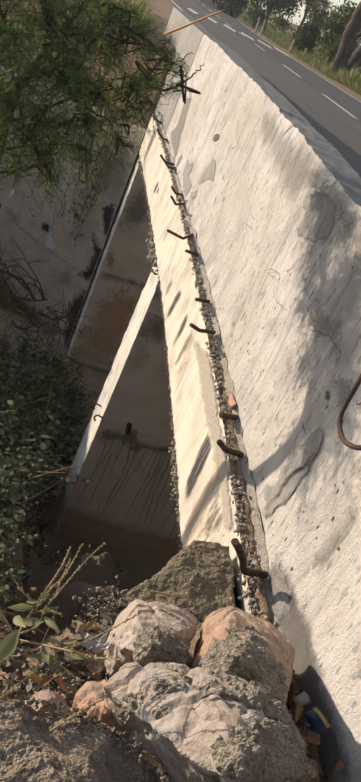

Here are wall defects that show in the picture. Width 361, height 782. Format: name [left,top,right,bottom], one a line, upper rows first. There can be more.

water stain [102,183,166,235]
corrosion [167,229,199,256]
peeling [297,192,336,263]
water stain [54,236,145,319]
water stain [64,290,86,346]
corrosion [189,323,216,334]
spalling [153,117,324,634]
water stain [77,430,180,542]
water stain [186,435,211,496]
corrosion [217,439,244,458]
corrosion [231,538,269,579]